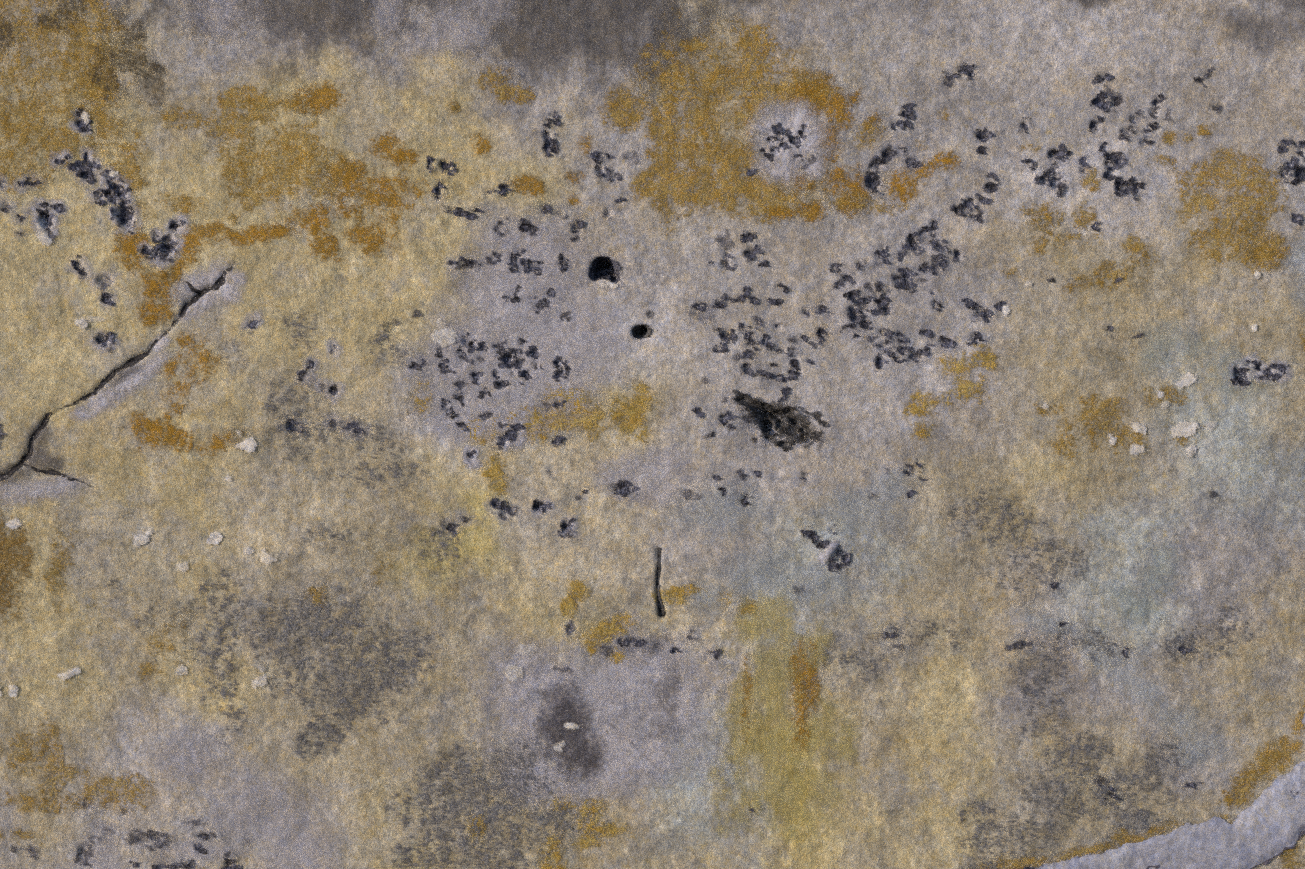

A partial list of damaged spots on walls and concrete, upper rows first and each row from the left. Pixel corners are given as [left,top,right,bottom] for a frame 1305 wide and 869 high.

rust [0,0,432,327]
leakage [410,0,685,72]
spalling [746,123,807,176]
rust [602,19,960,249]
spalling [949,172,1000,224]
rust [1156,123,1291,273]
crack [0,266,232,487]
rust [130,332,242,457]
leakage [422,221,612,439]
spalling [691,220,1011,452]
spalling [1228,354,1290,387]
leakage [383,628,703,869]